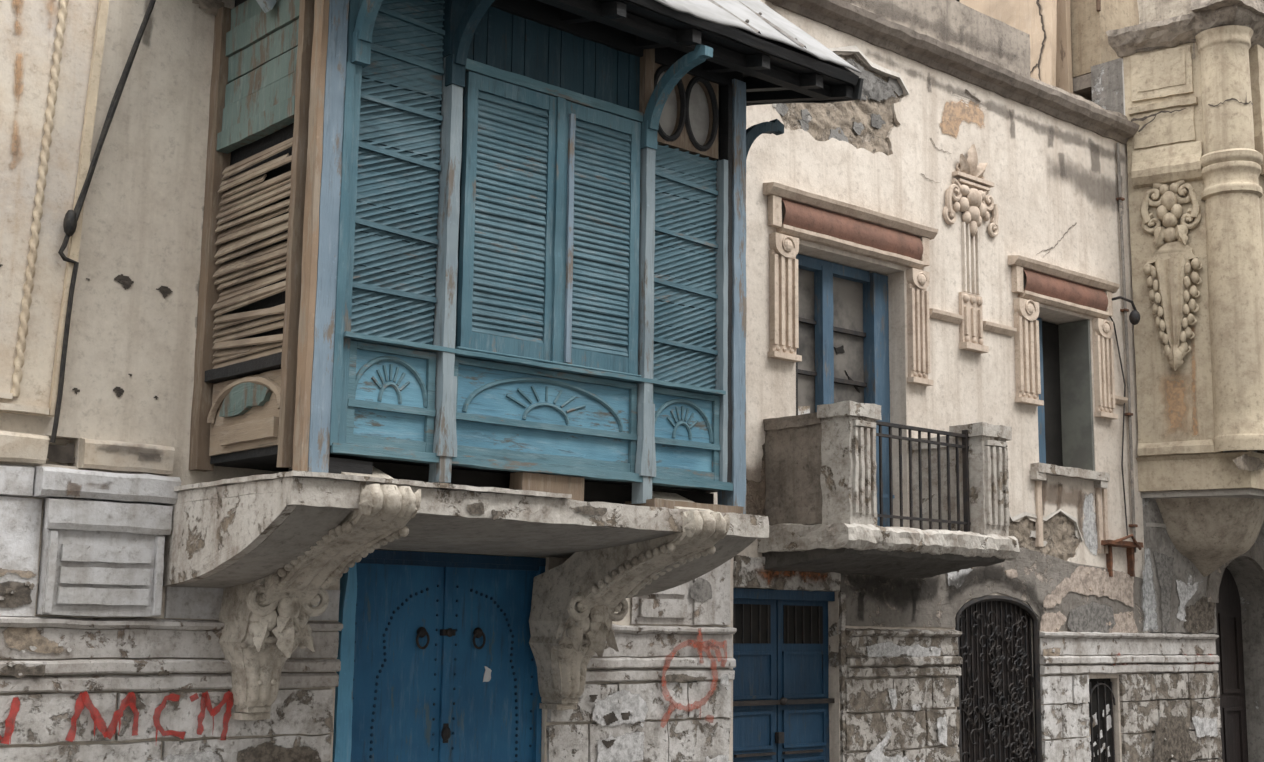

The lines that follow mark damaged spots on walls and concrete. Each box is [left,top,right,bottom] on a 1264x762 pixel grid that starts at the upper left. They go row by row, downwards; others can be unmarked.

corrosion [13,0,22,32]
crack [1030,0,1046,81]
corrosion [15,54,23,97]
spalling [772,45,909,156]
peeling [940,100,984,137]
peeling [0,568,36,608]
spalling [1009,509,1138,633]
peeling [2,627,72,678]
peeling [866,642,942,657]
peeling [237,742,321,762]
peeling [865,730,925,762]
peeling [937,716,947,747]